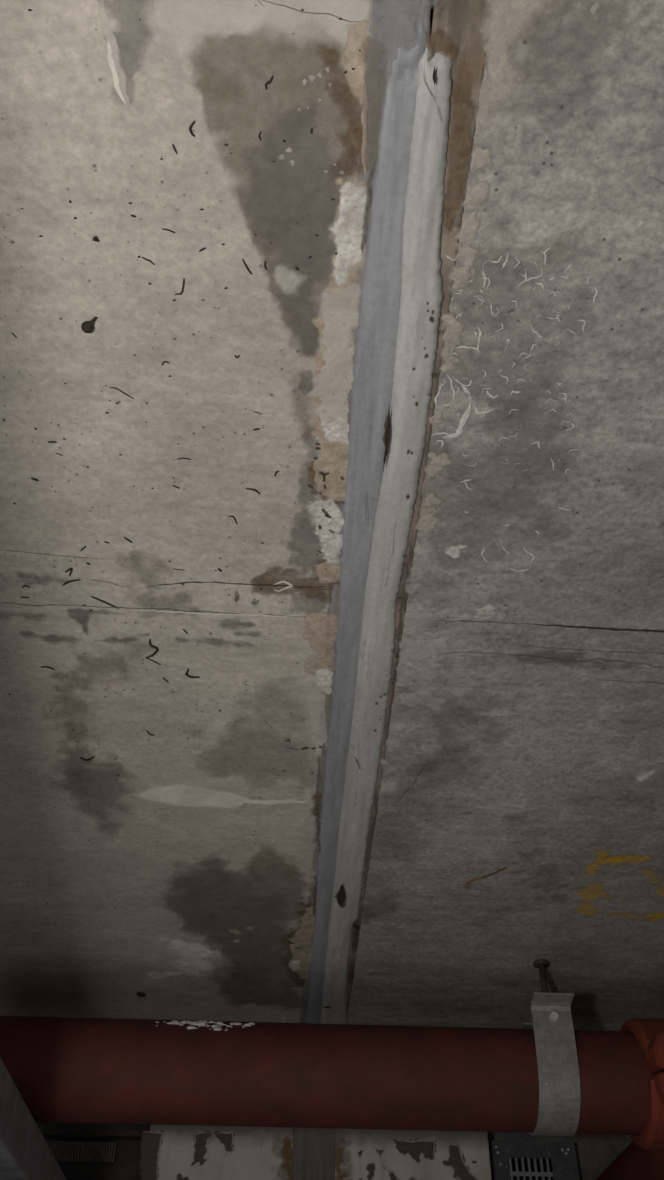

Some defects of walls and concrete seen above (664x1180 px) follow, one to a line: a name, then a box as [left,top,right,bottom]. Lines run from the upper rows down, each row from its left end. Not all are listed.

leakage [154,0,424,444]
leakage [430,247,586,490]
crack [5,550,325,590]
leakage [137,784,322,1023]
leakage [155,1020,255,1031]
peeling [140,1131,163,1180]
peeling [177,1131,235,1180]
peeling [358,1138,477,1180]